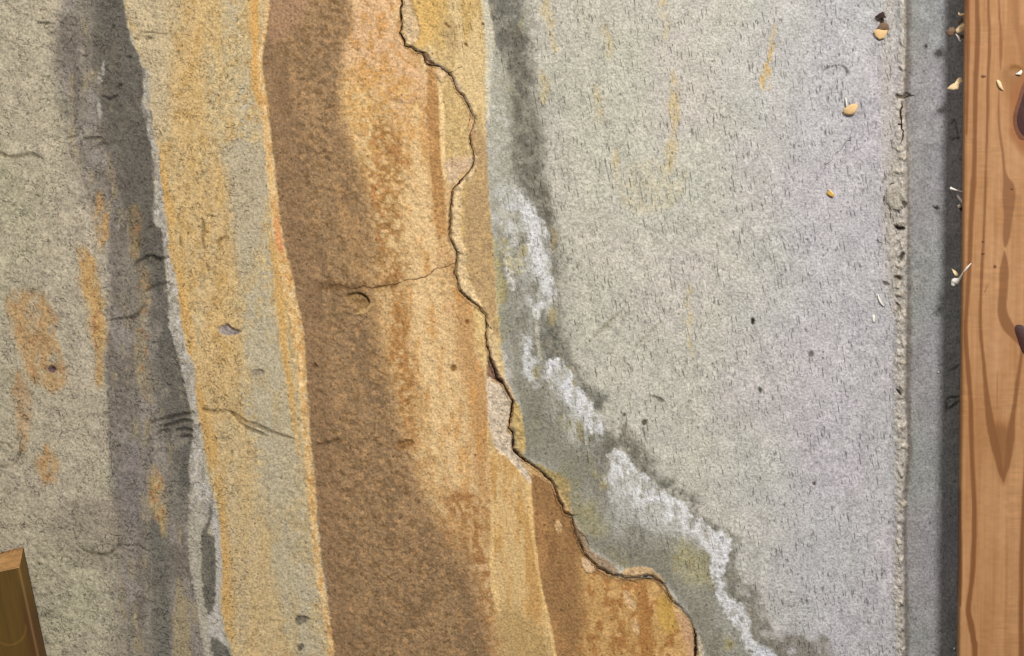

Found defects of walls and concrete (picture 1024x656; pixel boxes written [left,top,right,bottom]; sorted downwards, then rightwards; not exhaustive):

water stain [39,0,232,656]
corrosion [345,0,555,656]
crack [330,0,697,656]
corrosion [546,225,561,255]
water stain [479,0,838,656]